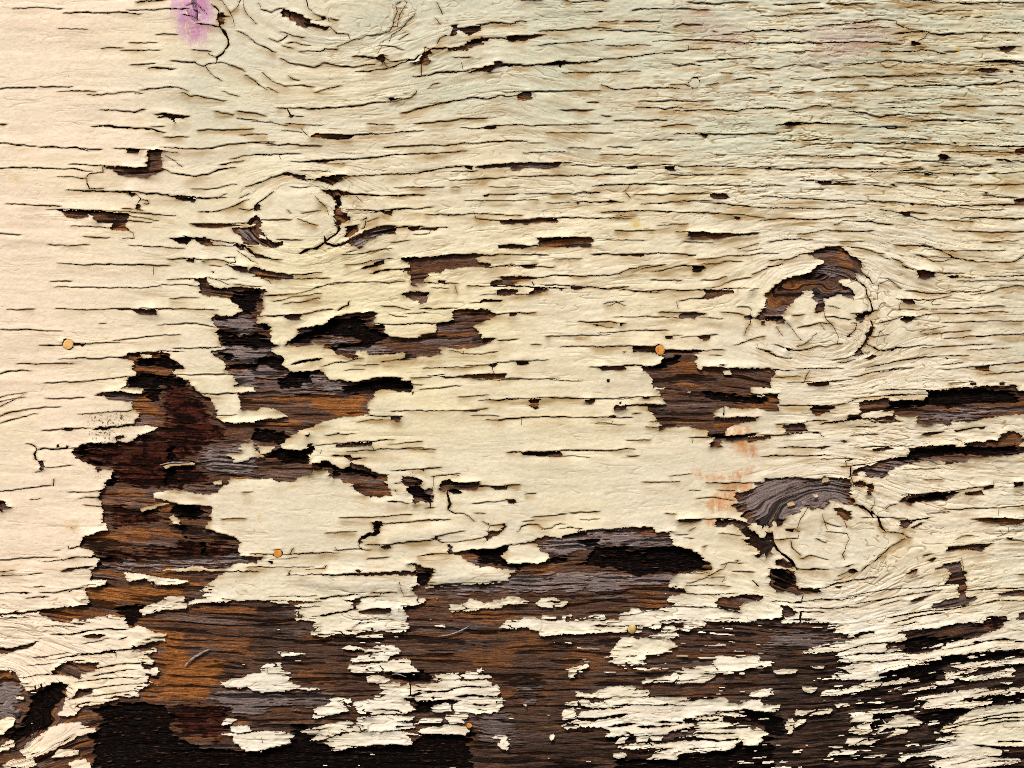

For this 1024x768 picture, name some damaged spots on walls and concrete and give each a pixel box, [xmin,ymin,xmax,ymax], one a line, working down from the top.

crack [0,0,1024,574]
peeling [0,205,1024,768]
crack [606,468,1024,663]